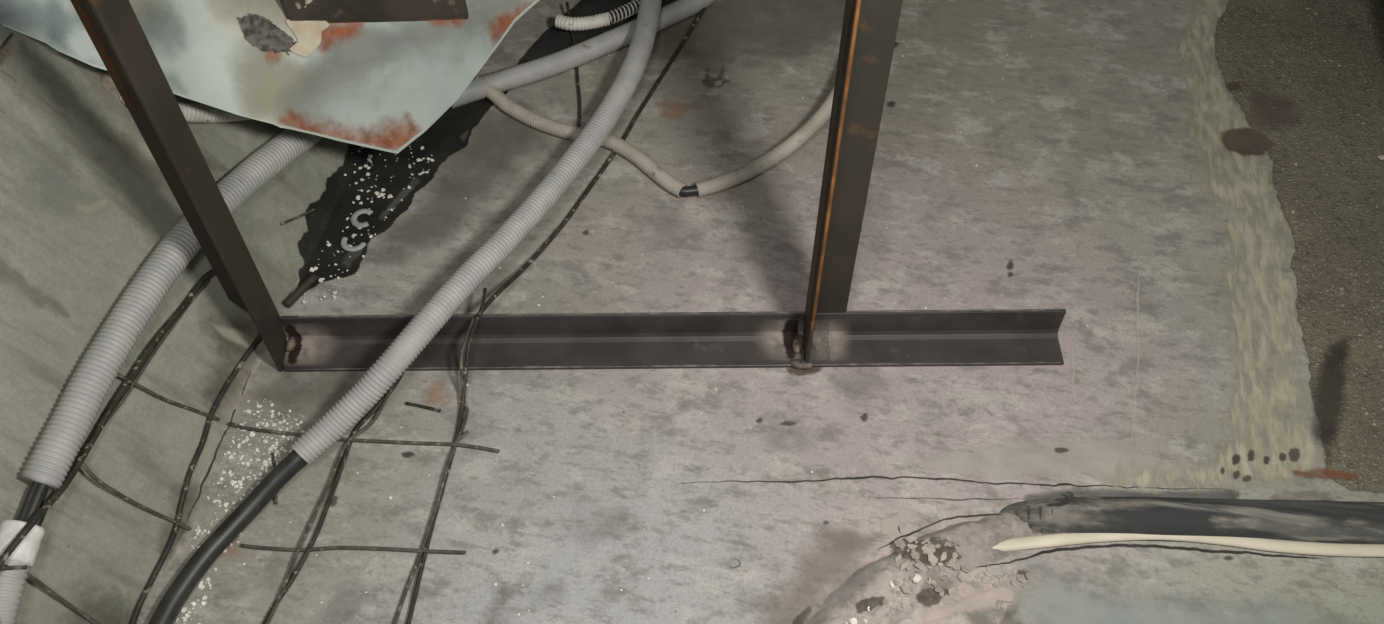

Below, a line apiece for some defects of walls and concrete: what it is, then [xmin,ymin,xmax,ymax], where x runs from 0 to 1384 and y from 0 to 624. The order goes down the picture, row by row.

corrosion [812,0,861,329]
spalling [846,534,1032,624]
crack [680,476,1228,550]
crack [977,544,1317,567]